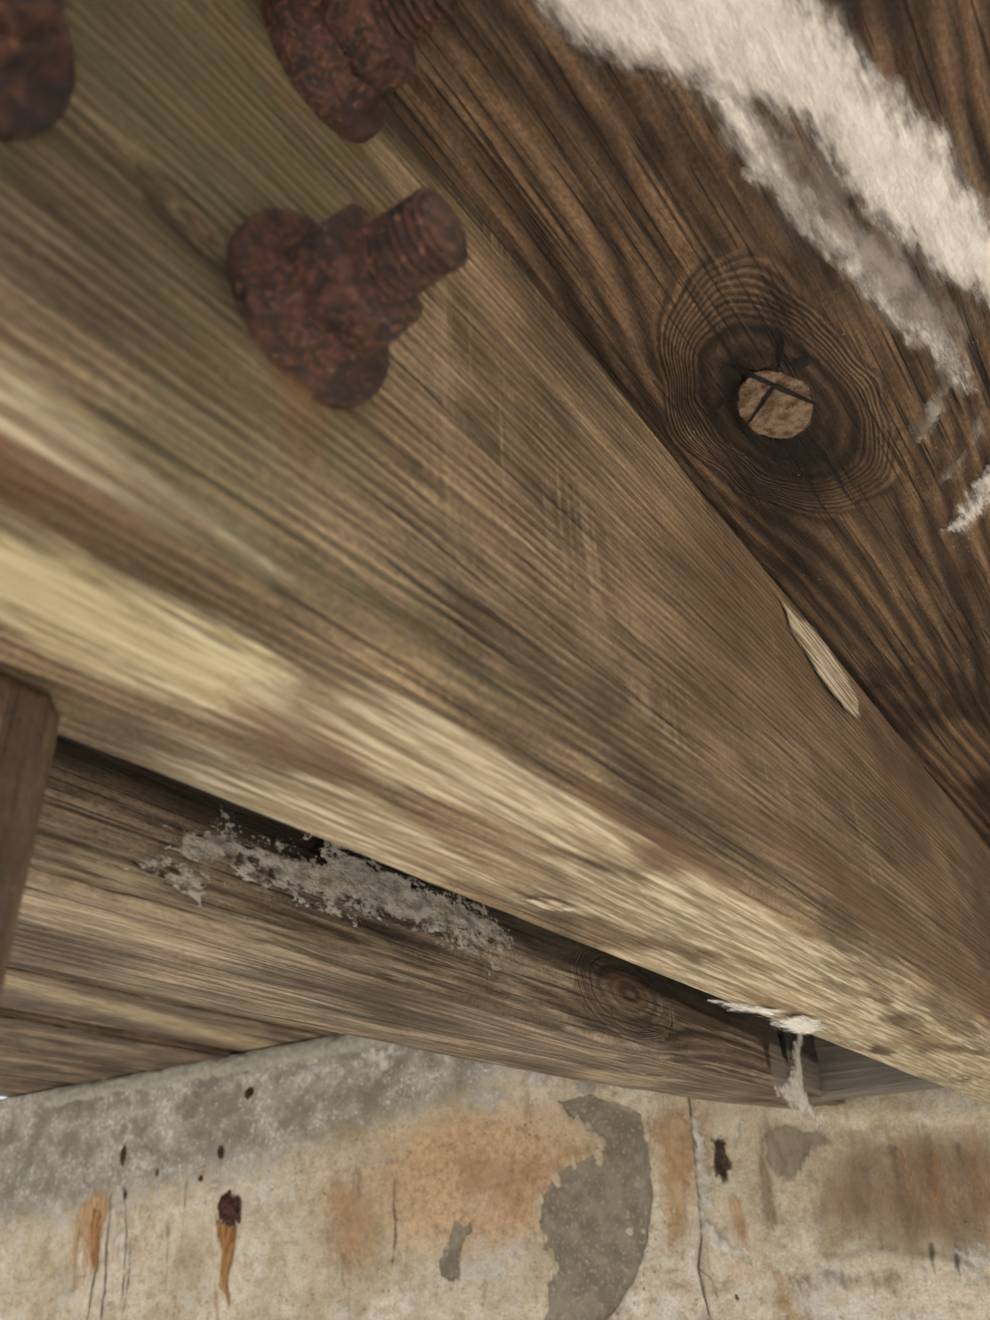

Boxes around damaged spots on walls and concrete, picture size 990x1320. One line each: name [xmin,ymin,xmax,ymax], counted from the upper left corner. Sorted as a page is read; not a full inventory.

water stain [541,0,990,439]
water stain [948,468,990,531]
water stain [524,898,578,912]
water stain [710,1000,831,1127]
rust [72,1192,107,1289]
rust [214,1190,241,1317]
peeling [532,1094,668,1320]